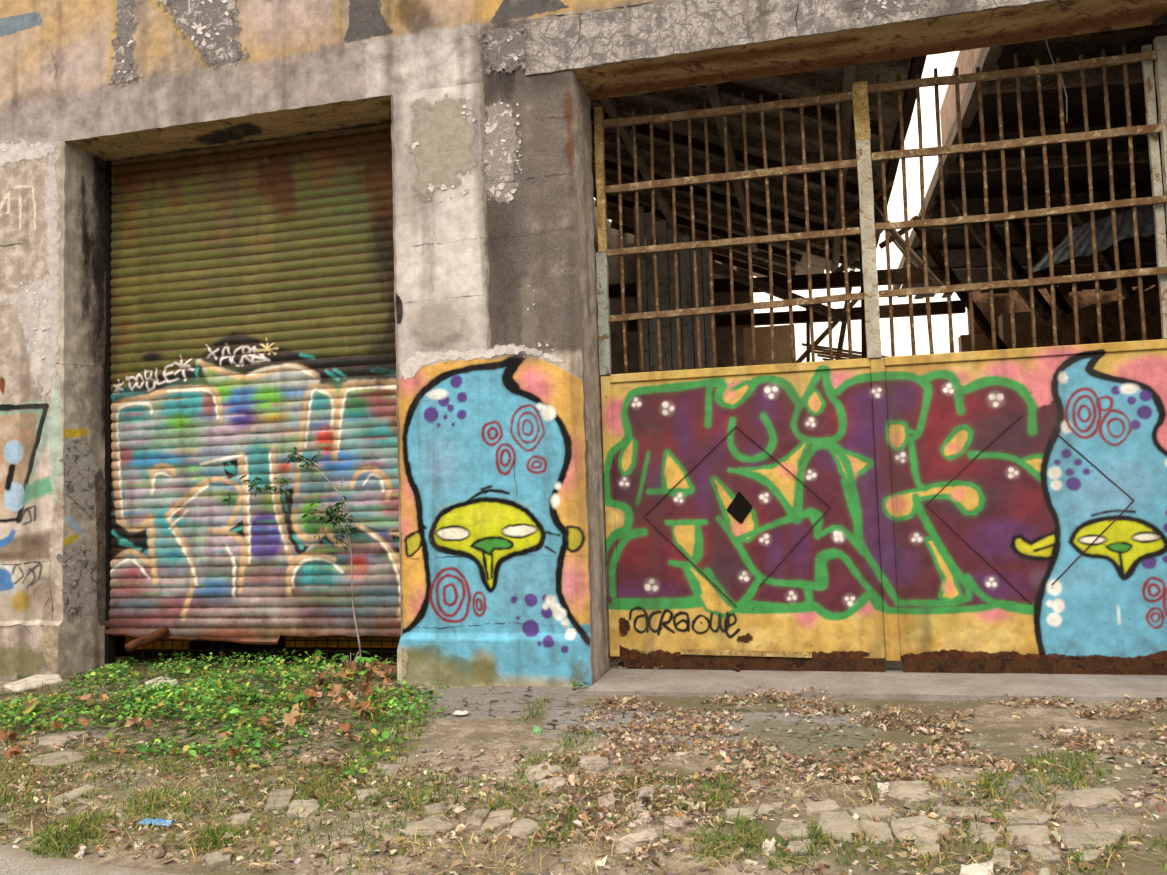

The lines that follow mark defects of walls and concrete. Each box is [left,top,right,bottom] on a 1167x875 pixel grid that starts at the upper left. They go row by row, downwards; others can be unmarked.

peeling [105,0,143,88]
peeling [157,0,250,71]
crack [531,0,688,59]
peeling [405,94,524,204]
peeling [0,138,61,399]
leakage [81,119,391,436]
corrosion [812,650,870,658]
corrosion [900,649,1167,661]